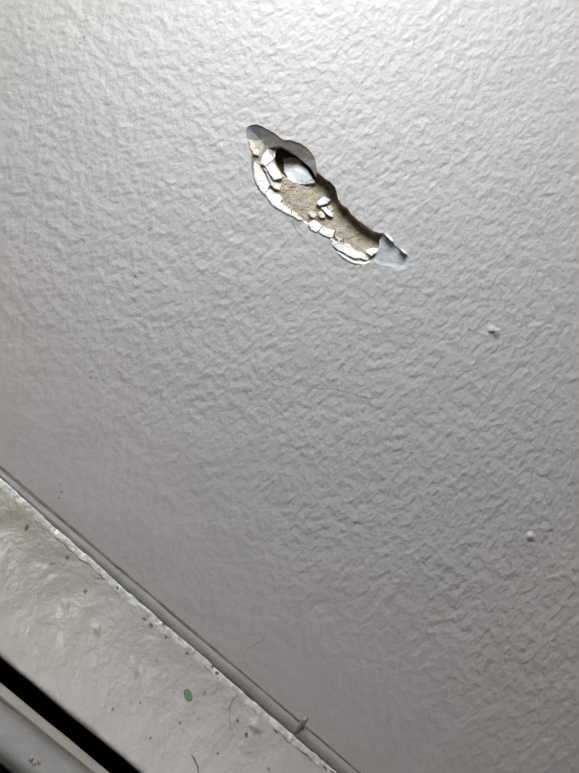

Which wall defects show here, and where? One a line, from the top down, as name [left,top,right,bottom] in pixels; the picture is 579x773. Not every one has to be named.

spalling [246,124,410,271]